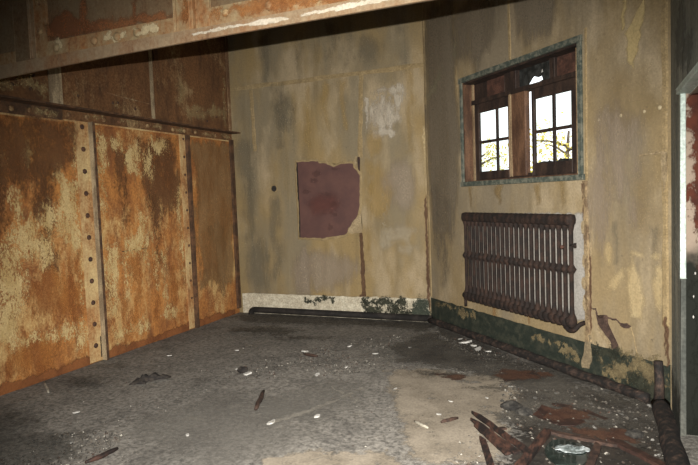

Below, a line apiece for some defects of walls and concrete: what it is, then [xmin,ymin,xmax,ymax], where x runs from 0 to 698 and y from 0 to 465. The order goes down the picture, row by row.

rust [45,0,197,41]
rust [209,0,346,18]
damp [364,83,404,139]
rust [0,114,82,320]
rust [114,150,130,222]
rust [137,137,181,318]
flaking render [295,156,363,241]
rust [109,253,191,358]
damp [360,295,432,320]
rust [0,338,95,396]
damp [591,342,654,400]